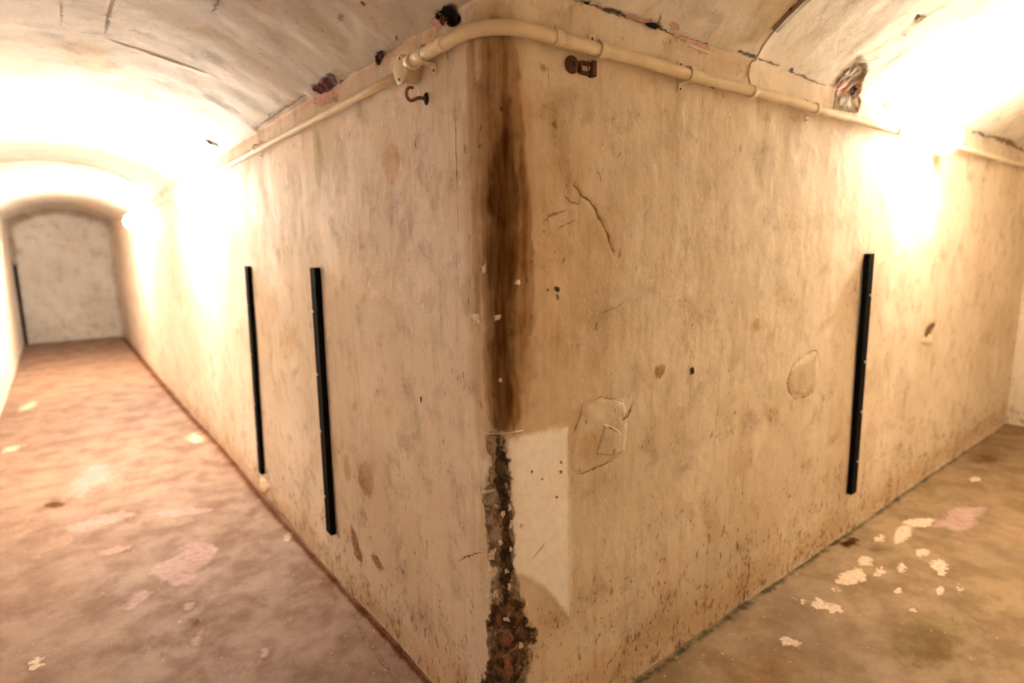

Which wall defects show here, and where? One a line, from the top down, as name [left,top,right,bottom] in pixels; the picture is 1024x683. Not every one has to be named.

flaking render [313,75,344,106]
flaking render [833,58,868,114]
crack [542,185,614,252]
flaking render [481,432,538,683]